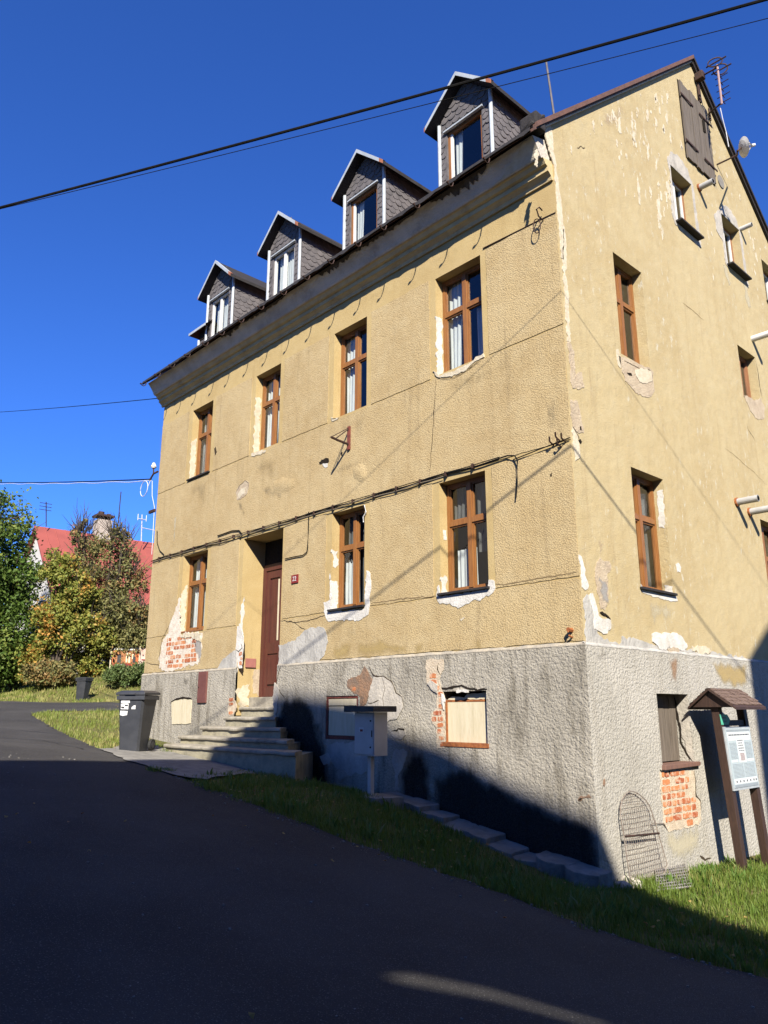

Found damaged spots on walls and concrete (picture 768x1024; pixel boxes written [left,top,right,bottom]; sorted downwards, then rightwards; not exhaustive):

peeling [590,93,683,241]
peeling [492,125,585,461]
spalling [616,349,655,398]
flaking render [158,585,203,672]
spalling [347,666,373,706]
flaking render [425,658,469,749]
peeling [578,555,612,634]
peeling [651,632,711,654]
flaking render [660,695,702,832]